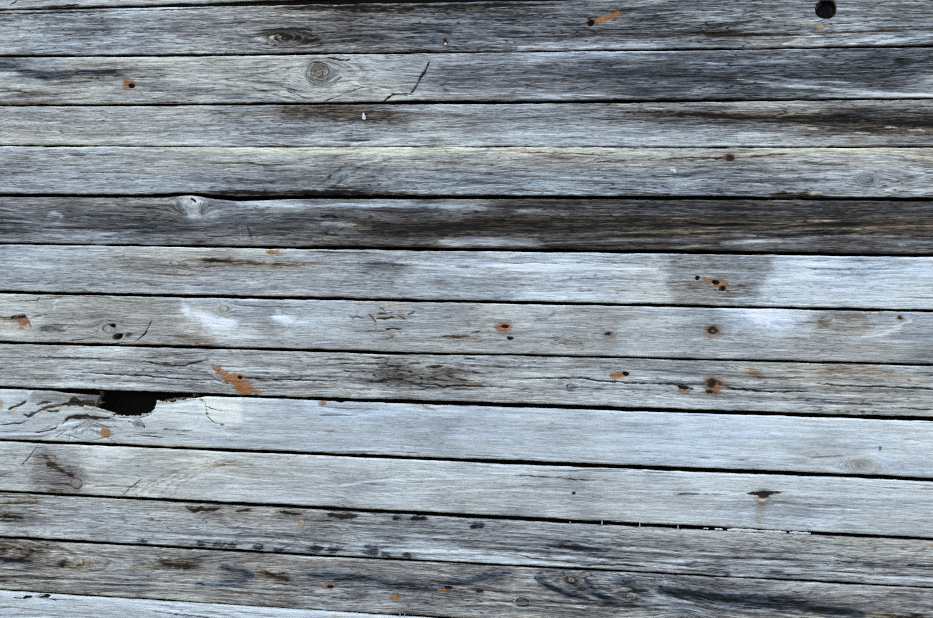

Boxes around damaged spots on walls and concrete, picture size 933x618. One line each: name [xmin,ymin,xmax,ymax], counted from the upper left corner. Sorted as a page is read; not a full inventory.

corrosion [586,12,622,26]
crack [288,57,364,101]
crack [384,62,430,102]
corrosion [695,276,727,294]
corrosion [496,323,513,340]
corrosion [213,366,258,395]
crack [2,303,693,464]
corrosion [706,378,723,395]
spalling [83,391,152,418]